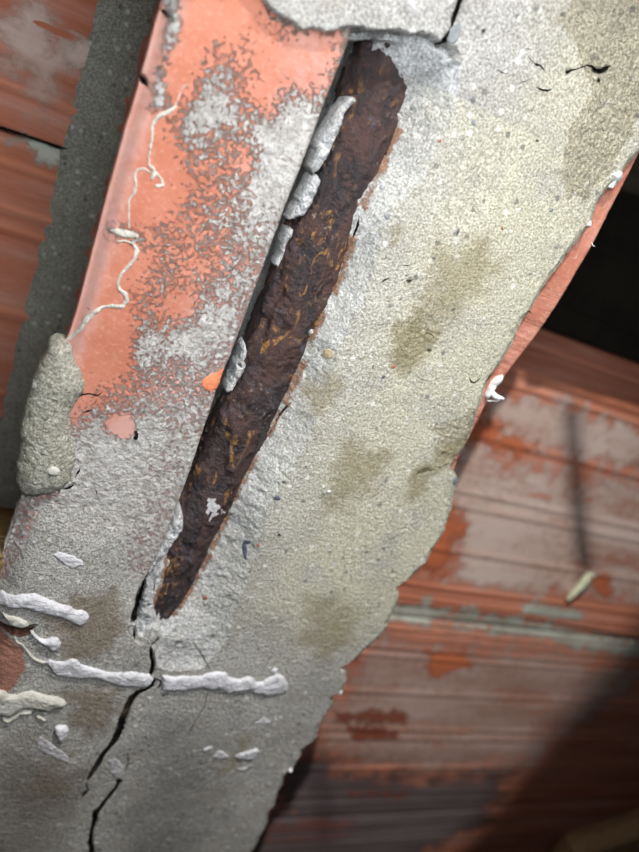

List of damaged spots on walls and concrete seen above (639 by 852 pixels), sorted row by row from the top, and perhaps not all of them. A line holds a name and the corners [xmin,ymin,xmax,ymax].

crack [435,0,462,45]
corrosion [357,127,403,210]
corrosion [332,235,356,295]
spalling [136,27,469,672]
corrosion [266,359,309,439]
crack [81,576,162,852]